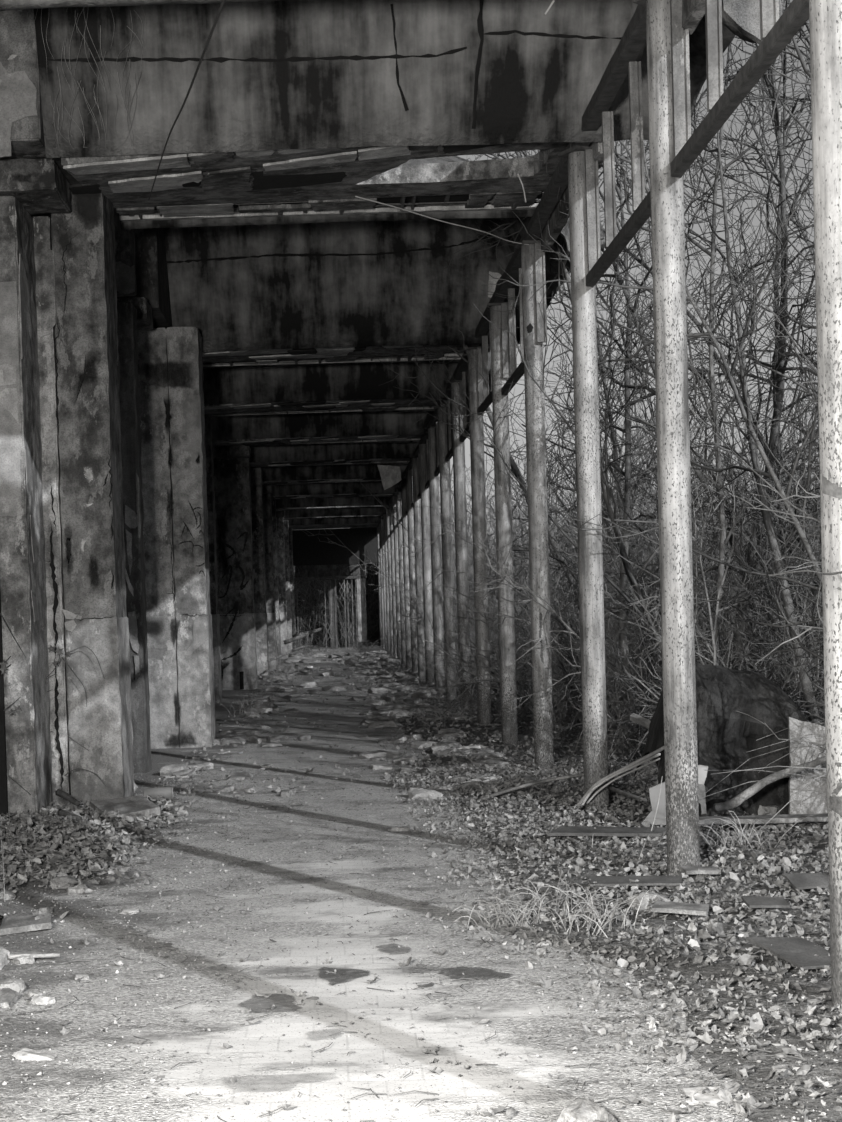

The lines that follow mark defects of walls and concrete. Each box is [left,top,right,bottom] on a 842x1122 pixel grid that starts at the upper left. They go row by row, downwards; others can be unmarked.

crack [48,0,622,129]
crack [103,454,114,540]
crack [45,484,113,790]